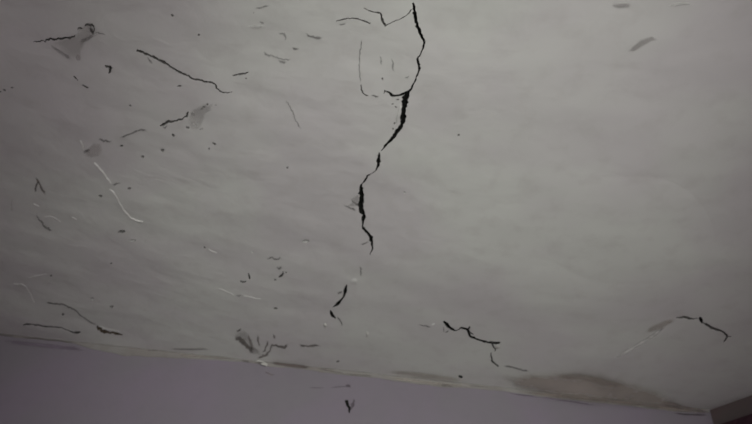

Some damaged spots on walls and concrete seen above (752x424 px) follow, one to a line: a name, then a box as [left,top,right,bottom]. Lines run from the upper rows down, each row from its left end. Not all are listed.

crack [34,35,76,43]
crack [137,49,248,93]
crack [84,112,189,152]
crack [330,3,426,324]
crack [23,302,122,335]
crack [422,321,526,371]
crack [676,316,731,342]